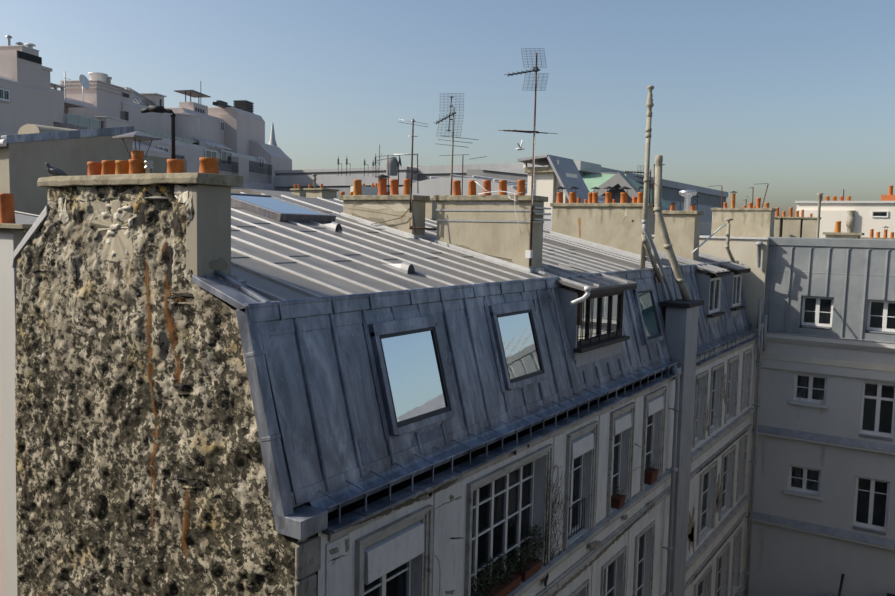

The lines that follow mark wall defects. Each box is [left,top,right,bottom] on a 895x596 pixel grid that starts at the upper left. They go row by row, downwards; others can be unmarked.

leakage [127,202,146,227]
leakage [162,242,172,286]
corrosion [162,243,186,384]
corrosion [144,260,158,538]